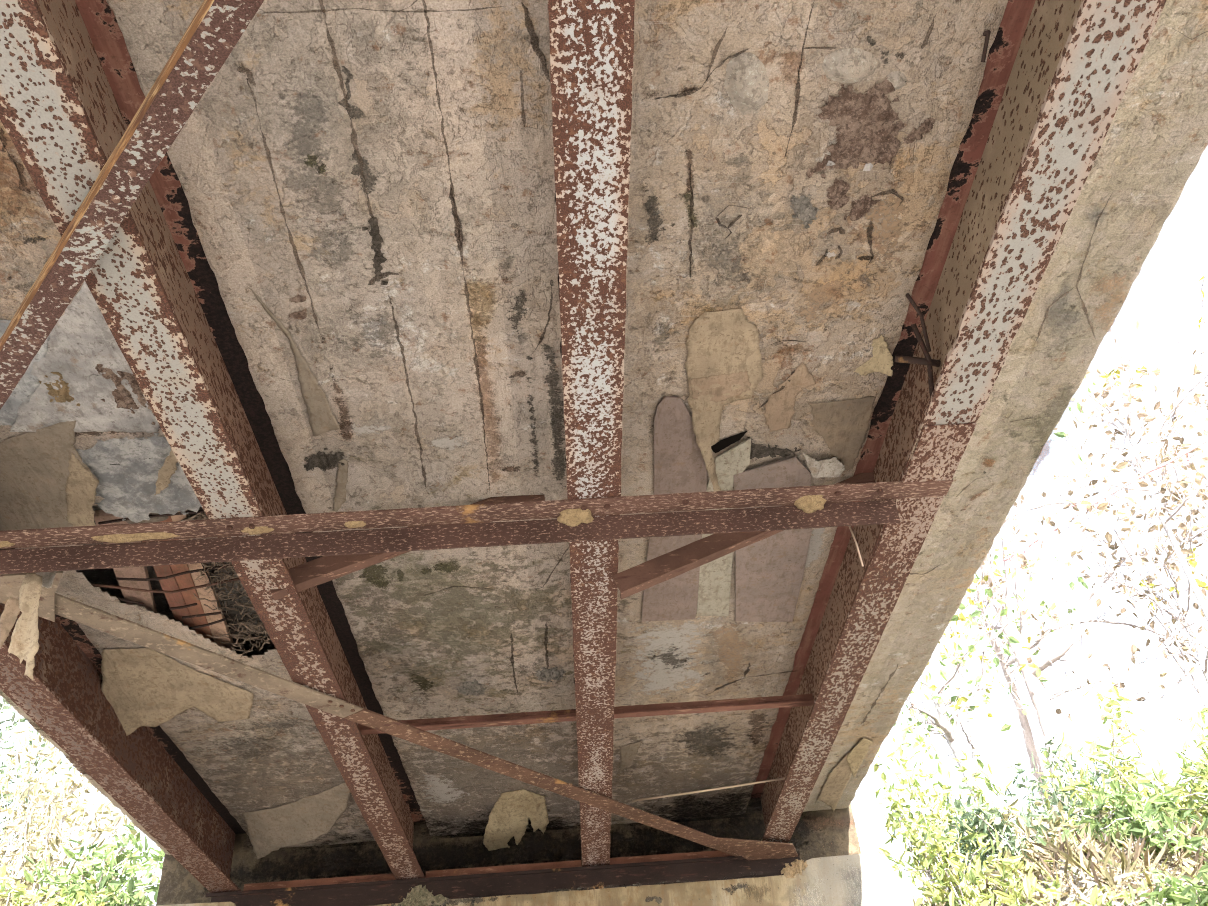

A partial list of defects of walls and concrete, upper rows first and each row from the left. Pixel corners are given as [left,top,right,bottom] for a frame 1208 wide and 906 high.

crack [785,0,837,156]
rust [0,128,31,194]
crack [256,0,554,489]
rust [1089,271,1133,332]
peeling [853,334,893,376]
peeling [0,280,205,531]
peeling [685,309,876,491]
rust [1030,440,1051,476]
spalling [91,563,240,630]
peeling [101,648,254,736]
peeling [242,783,351,859]